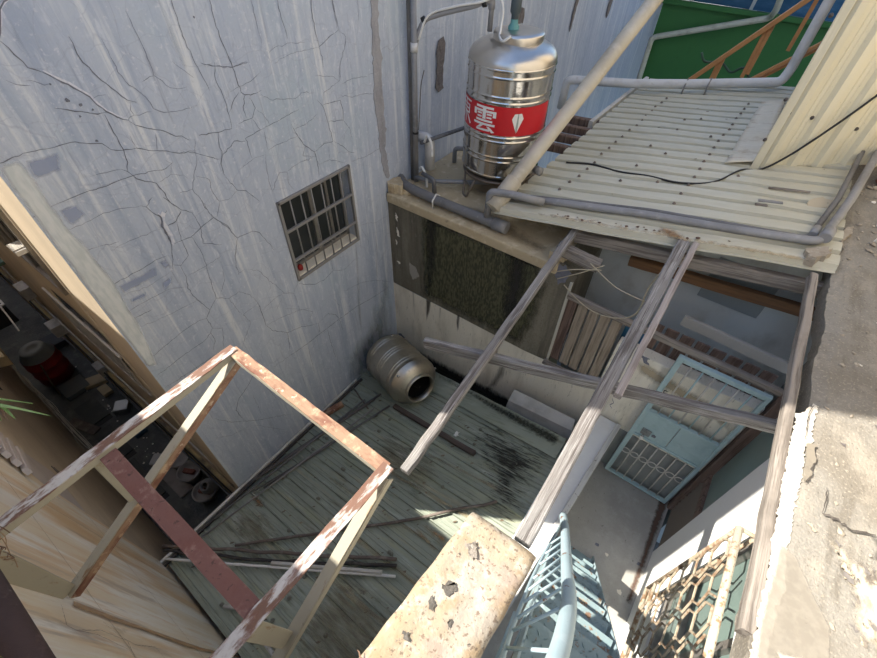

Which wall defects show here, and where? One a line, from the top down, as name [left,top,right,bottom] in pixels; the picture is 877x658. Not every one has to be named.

crack [0,0,384,385]
rust [73,601,215,653]
spalling [442,580,457,597]
peeling [834,540,877,648]